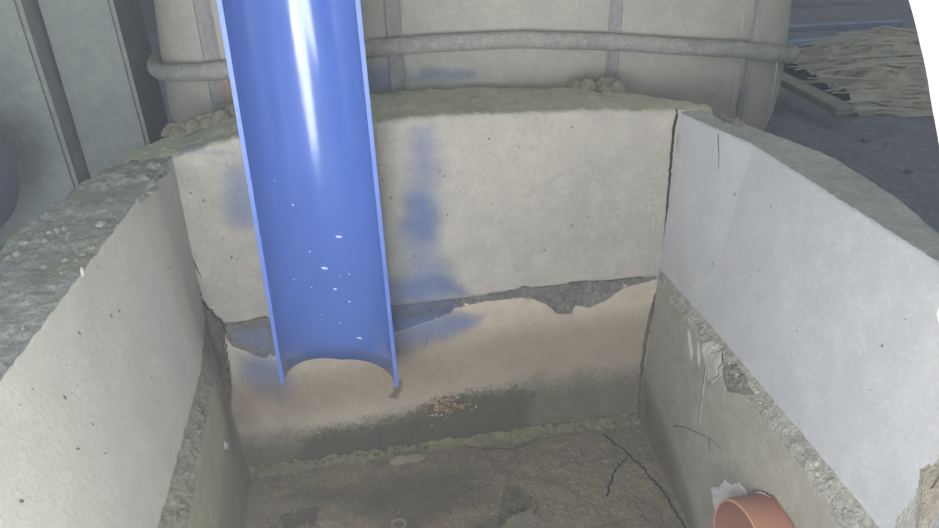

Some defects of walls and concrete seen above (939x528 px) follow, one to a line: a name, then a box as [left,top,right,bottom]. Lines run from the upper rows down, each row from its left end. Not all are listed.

crack [663,109,678,242]
spalling [391,276,657,334]
peeling [701,339,754,396]
damp [300,388,528,462]
crack [463,433,686,528]
peeling [915,463,939,528]